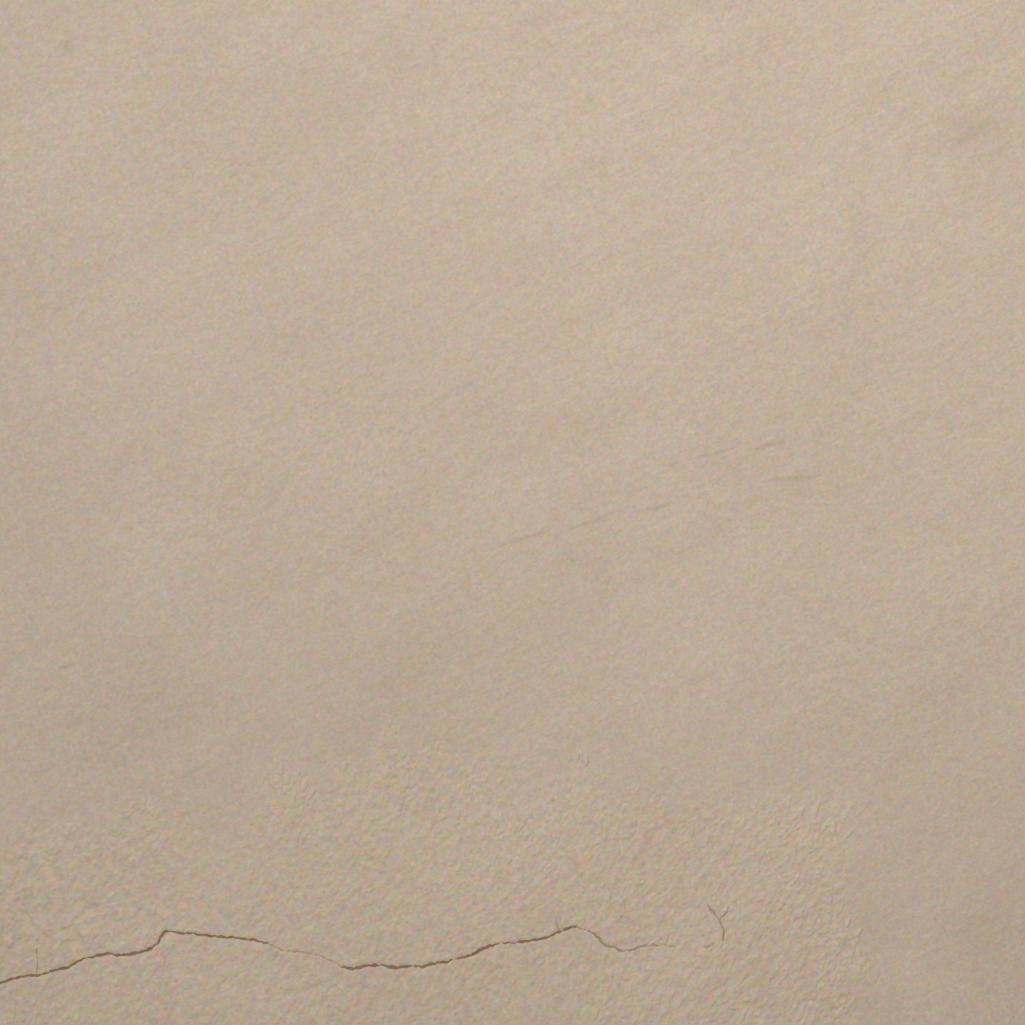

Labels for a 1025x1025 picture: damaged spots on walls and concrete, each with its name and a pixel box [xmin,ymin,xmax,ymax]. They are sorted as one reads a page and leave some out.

spalling [0,709,878,1025]
crack [0,921,676,984]
crack [704,904,728,948]